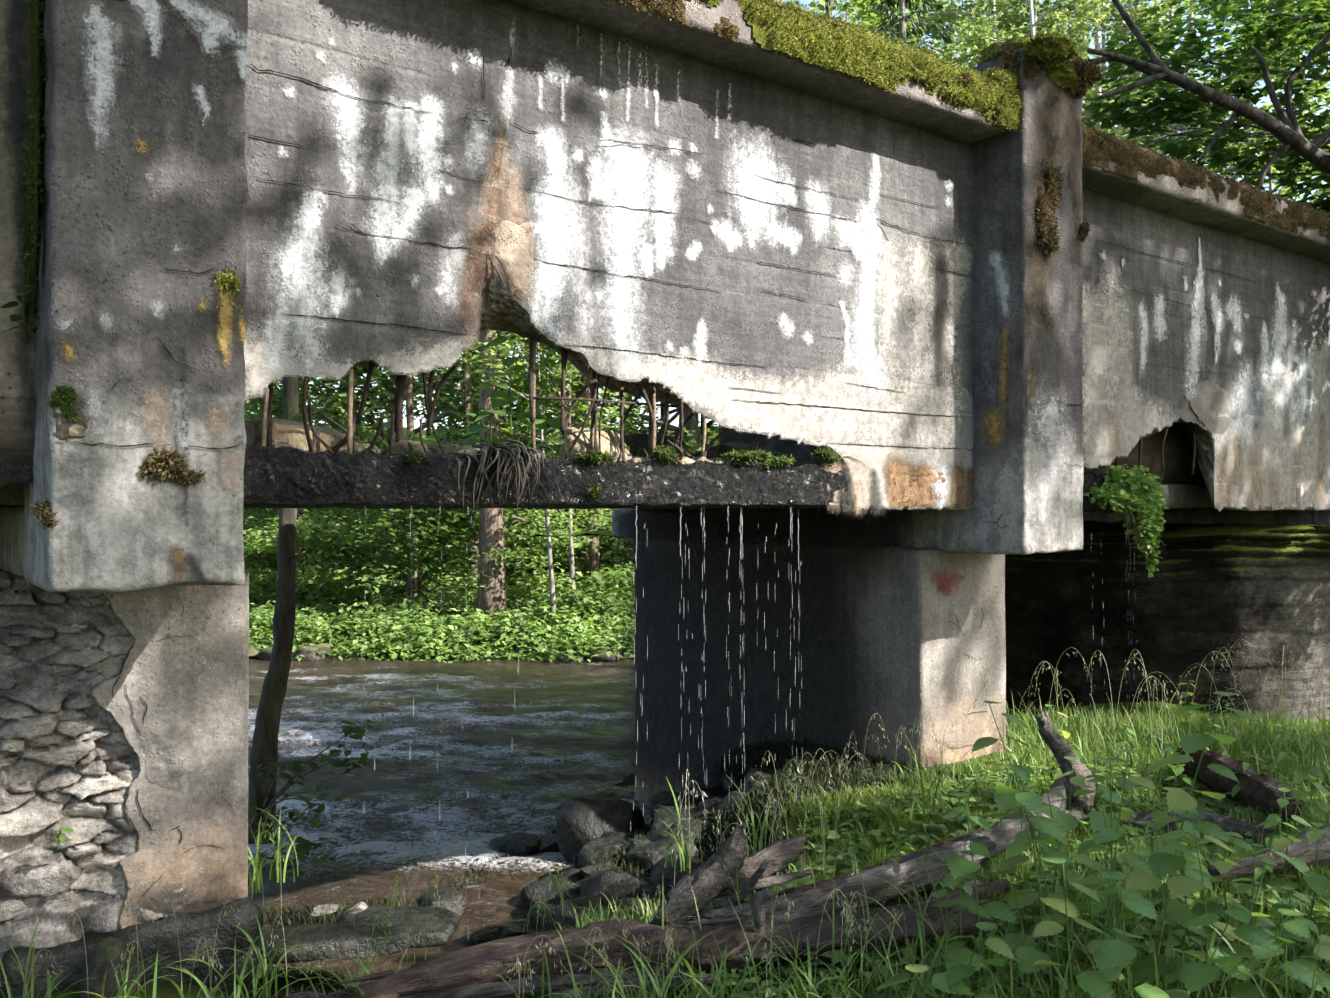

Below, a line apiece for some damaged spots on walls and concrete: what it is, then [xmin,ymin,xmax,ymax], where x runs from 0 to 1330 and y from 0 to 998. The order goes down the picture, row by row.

efflorescence [85,4,115,145]
efflorescence [131,0,247,79]
water stain [436,234,465,305]
rust [460,132,526,338]
spalling [480,220,711,419]
water stain [531,47,1009,792]
rust [830,462,870,508]
rust [885,458,975,508]
water stain [1027,280,1174,530]
spalling [1139,418,1213,464]
water stain [1183,238,1330,510]
crack [112,597,193,732]